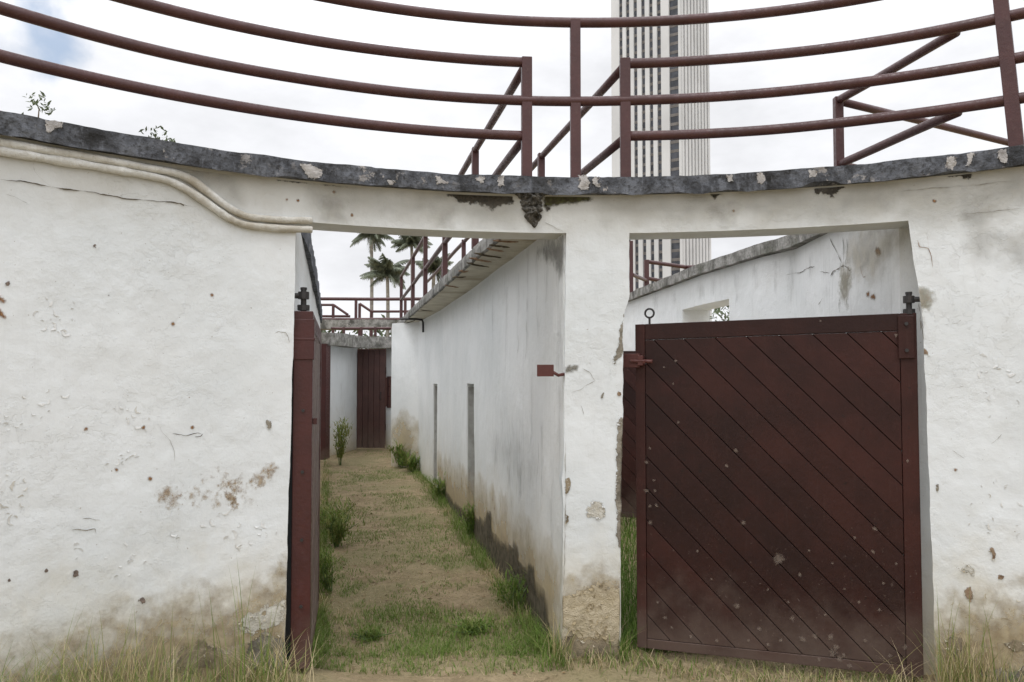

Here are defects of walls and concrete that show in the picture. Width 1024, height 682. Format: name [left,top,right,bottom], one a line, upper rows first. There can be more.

crack [0,173,187,206]
peeling [300,163,323,179]
crack [788,239,864,278]
spalling [586,418,623,547]
damp [438,468,555,638]
spalling [239,600,286,675]
peeling [562,581,620,660]